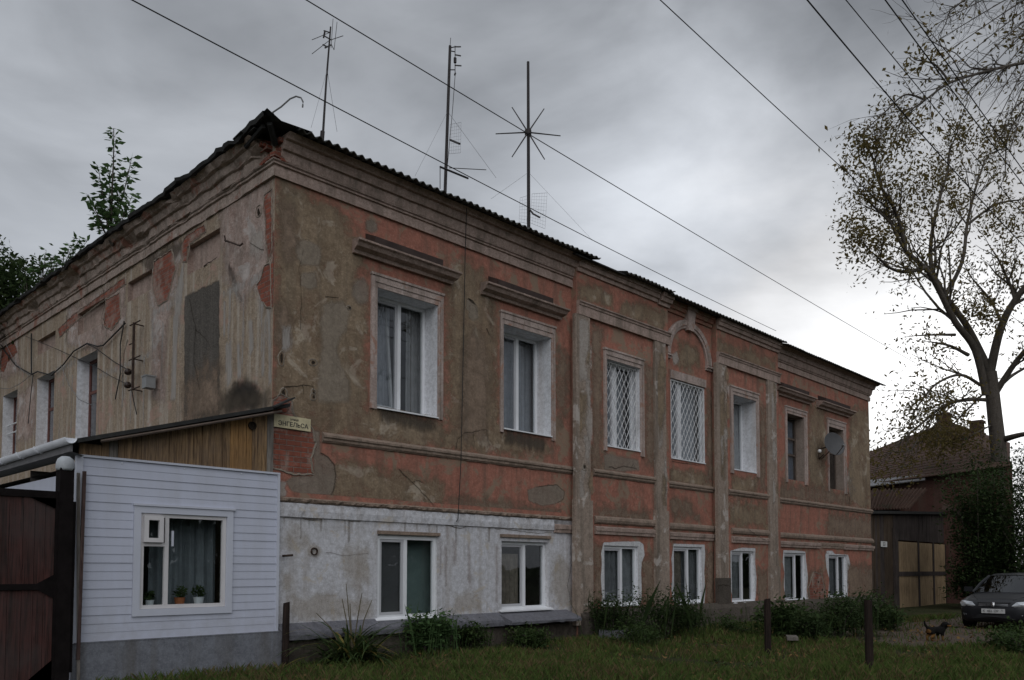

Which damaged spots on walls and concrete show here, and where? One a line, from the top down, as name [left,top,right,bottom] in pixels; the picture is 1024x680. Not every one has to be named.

flaking render [67,284,126,352]
flaking render [152,224,207,307]
damp [212,263,290,414]
peeling [218,180,561,512]